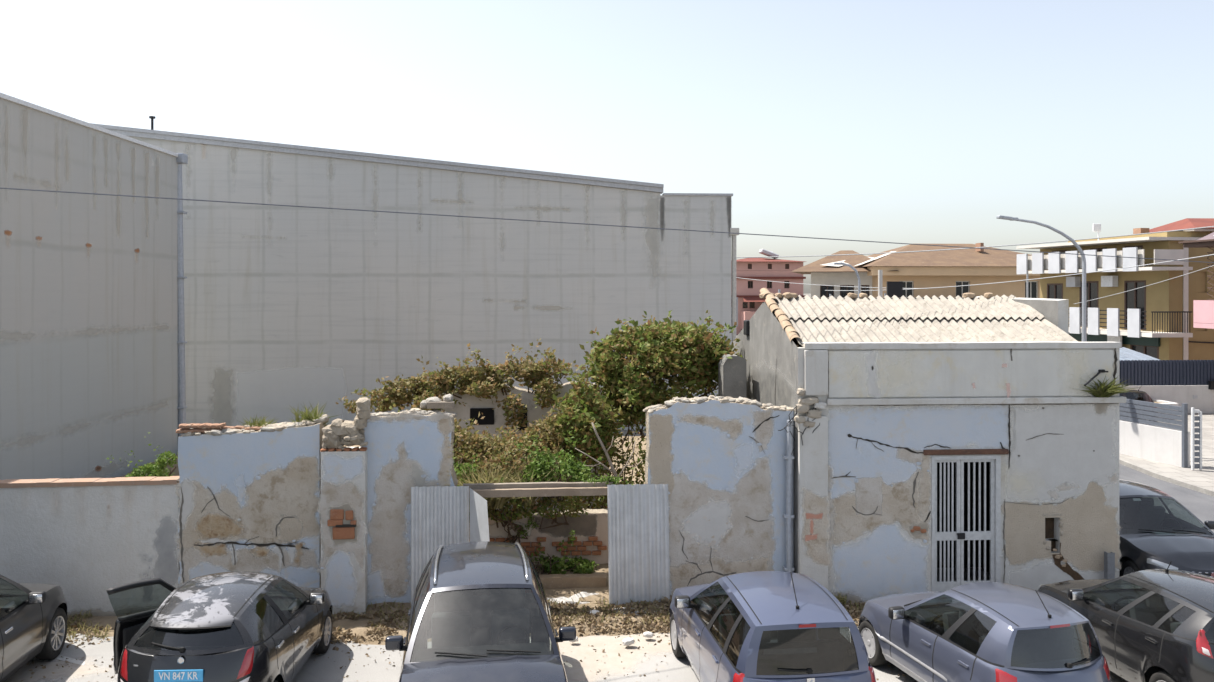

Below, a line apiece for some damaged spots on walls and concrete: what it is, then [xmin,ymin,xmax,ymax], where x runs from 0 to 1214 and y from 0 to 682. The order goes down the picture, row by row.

crack [749,377,779,452]
crack [179,486,309,583]
flaking render [176,417,453,598]
crack [679,531,736,586]
flaking render [646,409,775,596]
flaking render [802,447,931,567]
crack [831,436,950,508]
flaking render [999,475,1121,580]